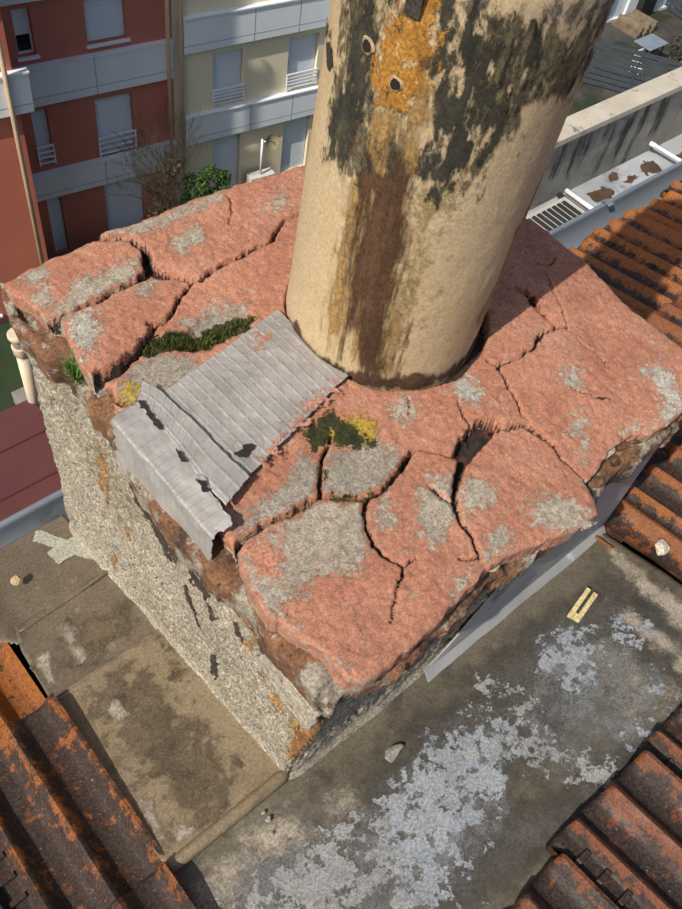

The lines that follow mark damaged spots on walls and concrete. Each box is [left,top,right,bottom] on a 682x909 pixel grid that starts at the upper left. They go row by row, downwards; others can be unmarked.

corrosion [369,0,447,177]
peeling [16,190,226,365]
peeling [109,352,203,407]
crack [49,226,283,394]
peeling [174,296,257,338]
water stain [253,0,611,468]
crack [430,259,568,562]
water stain [584,159,662,203]
crack [183,571,263,653]
crack [355,450,421,624]
water stain [190,802,332,909]
water stain [324,728,510,909]